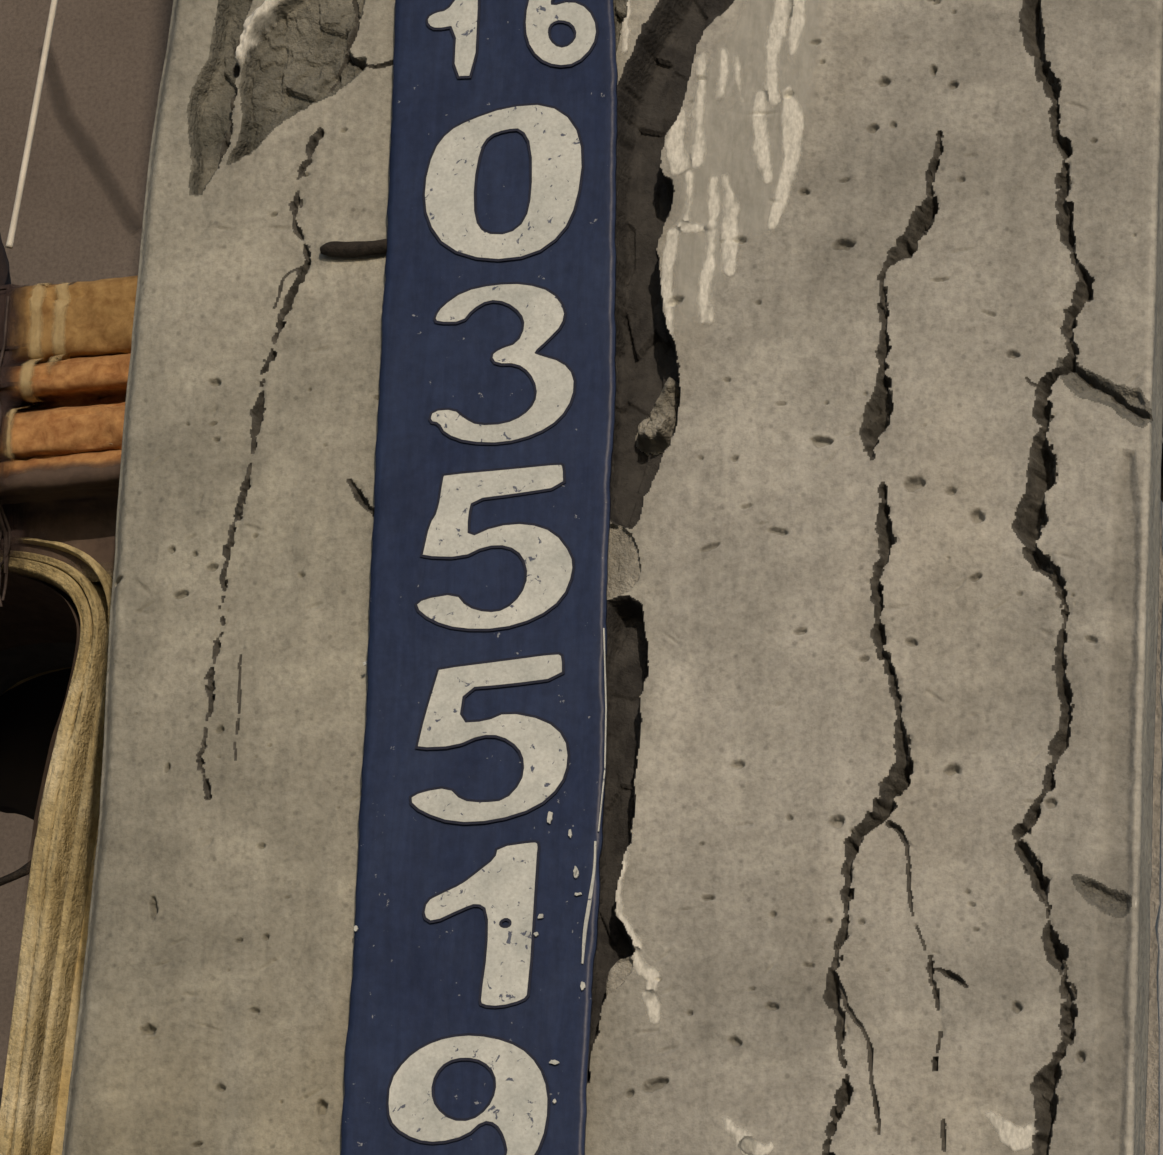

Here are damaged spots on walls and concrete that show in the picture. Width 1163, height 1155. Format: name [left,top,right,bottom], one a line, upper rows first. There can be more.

crack [213,39,241,174]
spalling [186,0,367,196]
crack [327,0,394,93]
damp [622,0,631,52]
damp [660,0,815,335]
crack [196,127,324,800]
crack [346,478,375,517]
crack [822,130,969,1155]
crack [1011,0,1153,1155]